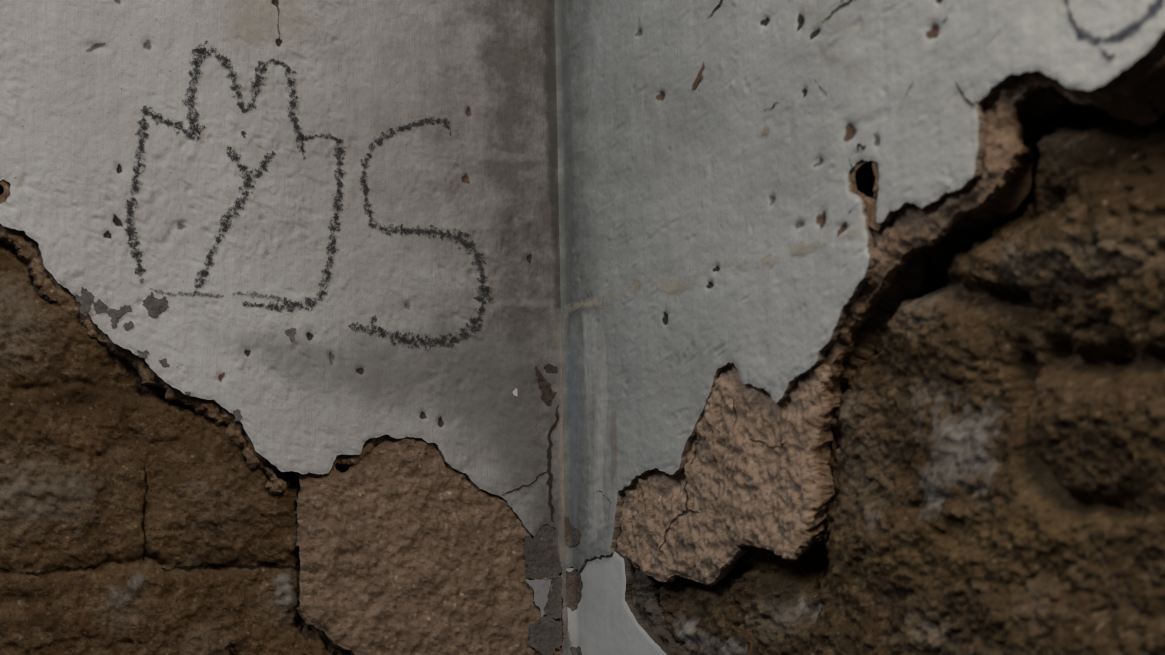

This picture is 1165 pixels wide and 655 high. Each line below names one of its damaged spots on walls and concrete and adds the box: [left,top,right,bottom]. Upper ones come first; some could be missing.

crack [821,0,851,23]
peeling [797,14,820,39]
peeling [926,23,939,38]
spalling [0,180,10,204]
peeling [104,214,123,238]
flaking render [566,41,1165,655]
flaking render [0,225,563,655]
water stain [923,416,998,510]
peeling [563,515,580,547]